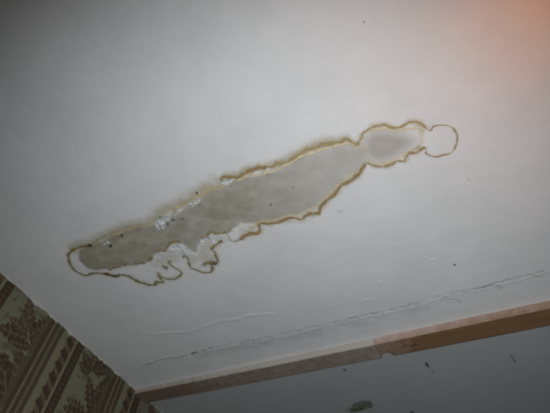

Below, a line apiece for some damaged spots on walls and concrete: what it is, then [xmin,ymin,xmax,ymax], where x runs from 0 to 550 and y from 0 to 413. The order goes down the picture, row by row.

peeling [154,199,200,230]
damp [67,121,458,286]